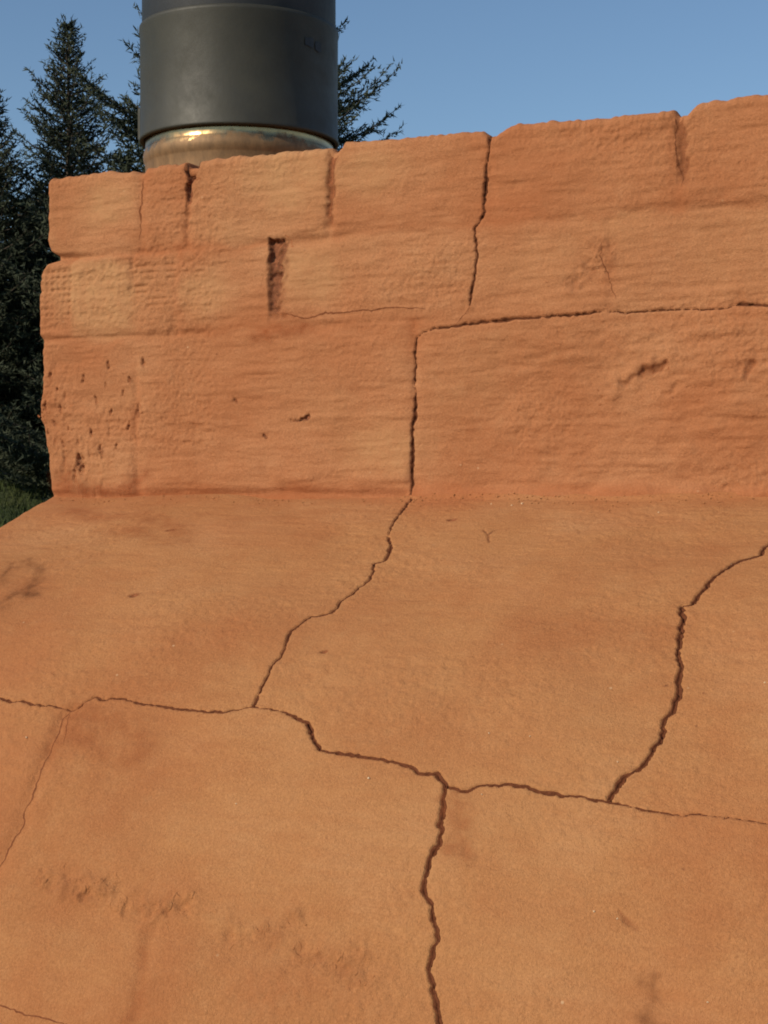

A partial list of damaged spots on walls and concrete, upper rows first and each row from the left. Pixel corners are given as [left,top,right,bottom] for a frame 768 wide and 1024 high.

crack [674,119,684,186]
crack [286,307,424,319]
crack [410,139,601,495]
crack [610,303,768,314]
crack [0,500,768,1024]